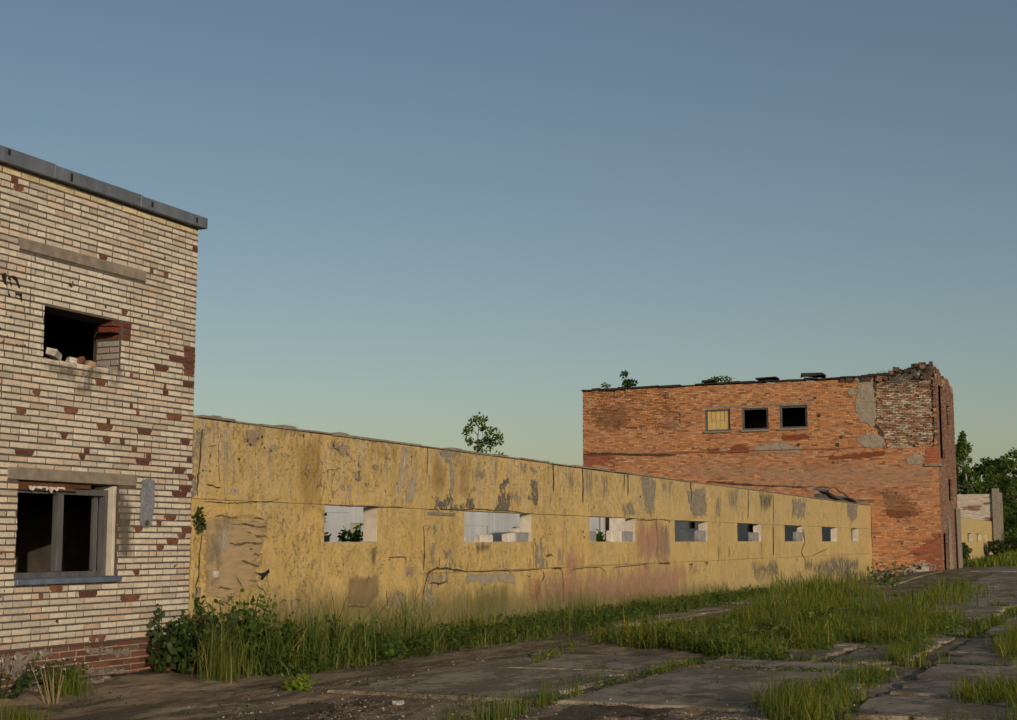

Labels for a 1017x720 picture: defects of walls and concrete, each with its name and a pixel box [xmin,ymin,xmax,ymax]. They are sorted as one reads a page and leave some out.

spalling [828,375,937,464]
peeling [434,450,485,512]
crack [429,507,529,515]
peeling [493,462,540,513]
crack [582,452,677,499]
peeling [687,487,707,519]
spalling [215,514,270,594]
crack [389,517,730,596]